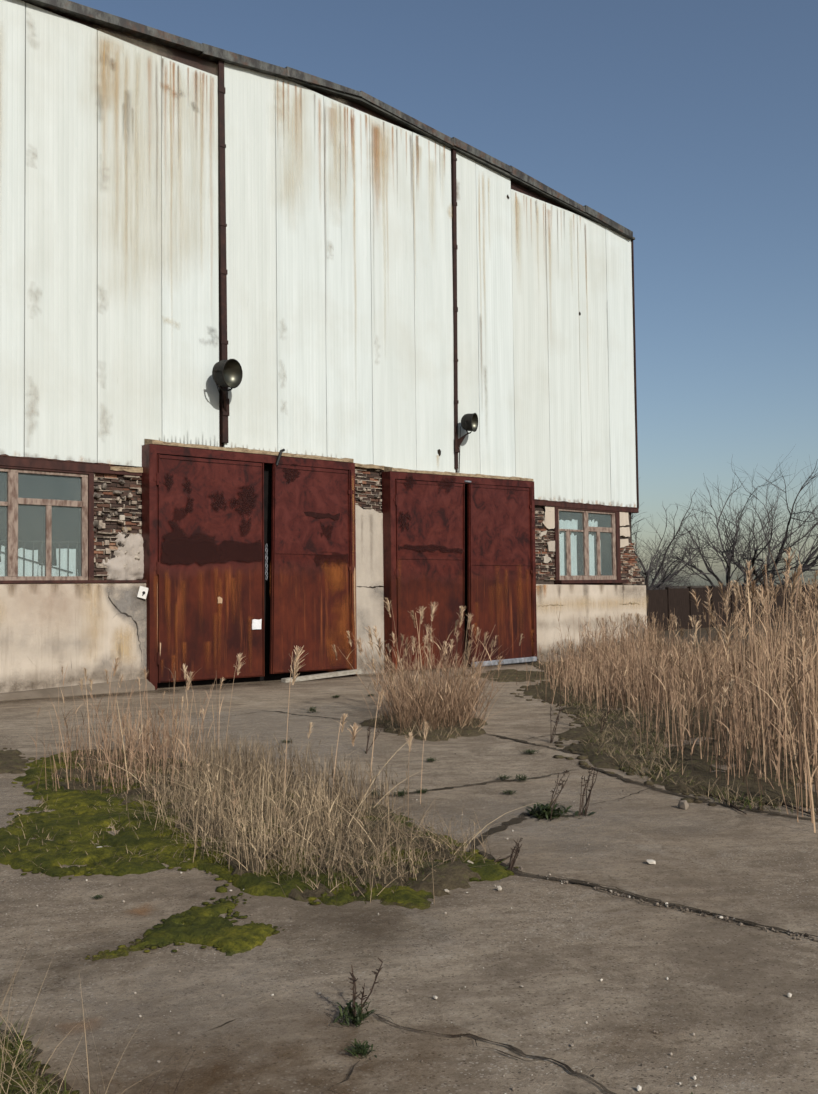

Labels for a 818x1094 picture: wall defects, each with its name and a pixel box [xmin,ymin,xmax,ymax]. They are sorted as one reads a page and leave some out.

spalling [93,473,142,580]
corrosion [161,486,263,566]
crack [108,592,145,662]
crack [560,876,818,939]
crack [372,1013,616,1094]